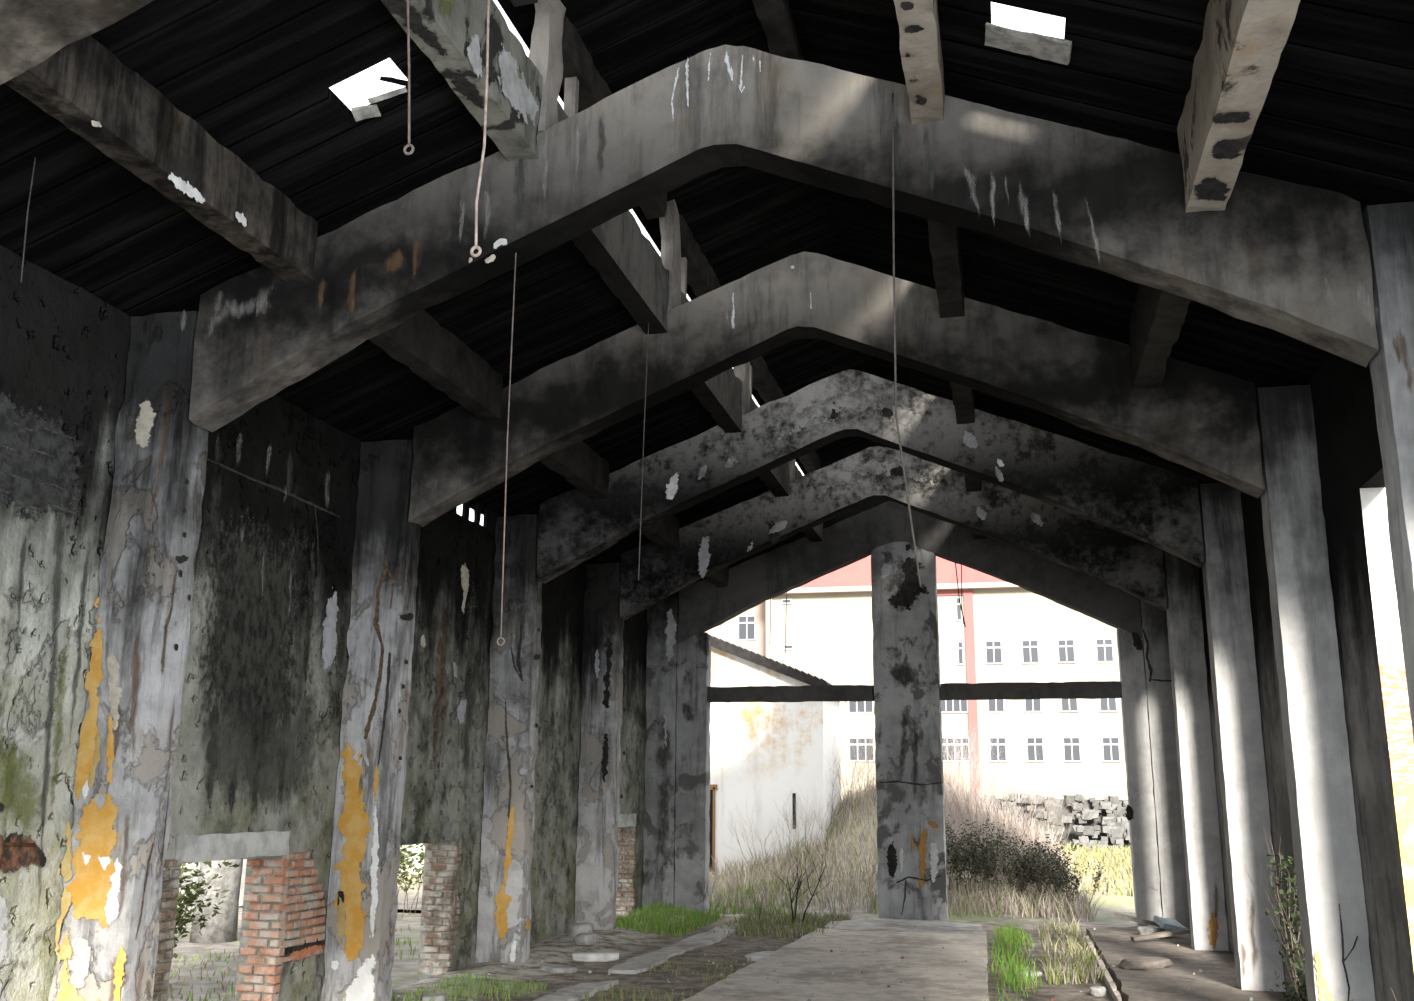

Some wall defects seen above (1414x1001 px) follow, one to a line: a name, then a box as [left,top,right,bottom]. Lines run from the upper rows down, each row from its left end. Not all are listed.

water stain [671,59,689,121]
water stain [708,51,761,93]
peeling [1211,112,1251,160]
spalling [168,172,205,204]
peeling [1194,177,1231,201]
water stain [195,499,315,814]
peeling [1,597,126,1001]
peeling [278,735,379,970]
peeling [494,806,530,962]
peeling [1314,952,1333,1001]